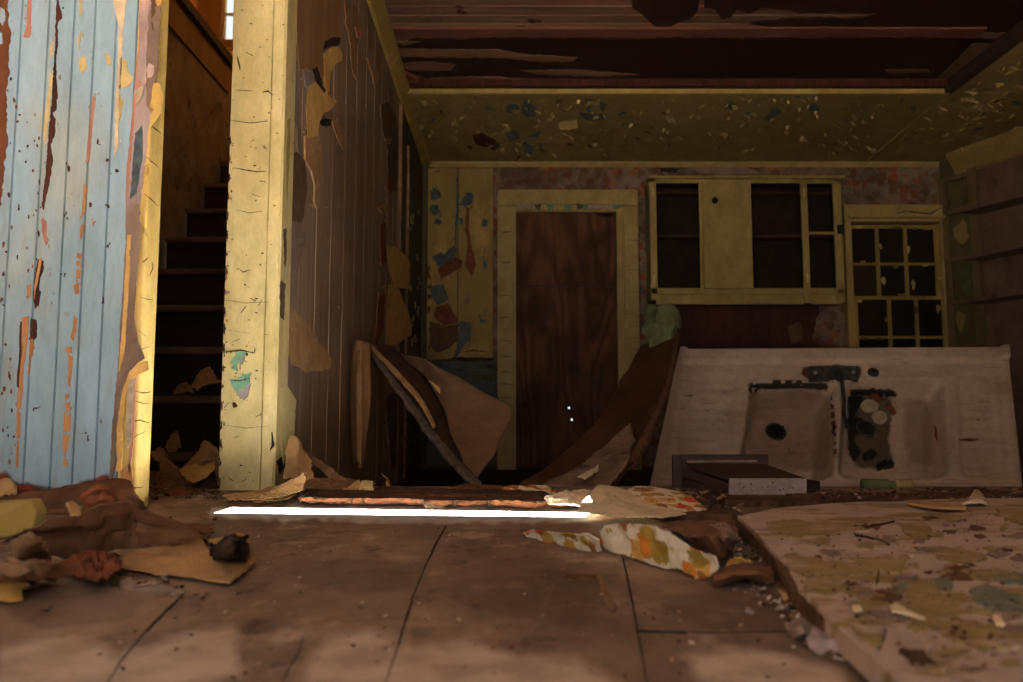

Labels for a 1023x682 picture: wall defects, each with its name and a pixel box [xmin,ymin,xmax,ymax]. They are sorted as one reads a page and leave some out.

peeling [0,0,64,247]
peeling [85,92,101,163]
peeling [104,0,133,172]
peeling [150,81,163,131]
peeling [301,37,346,208]
peeling [397,0,1023,78]
peeling [1,258,44,468]
peeling [62,315,77,466]
spalling [217,252,258,489]
peeling [259,228,287,267]
peeling [279,280,331,374]
peeling [373,169,487,360]